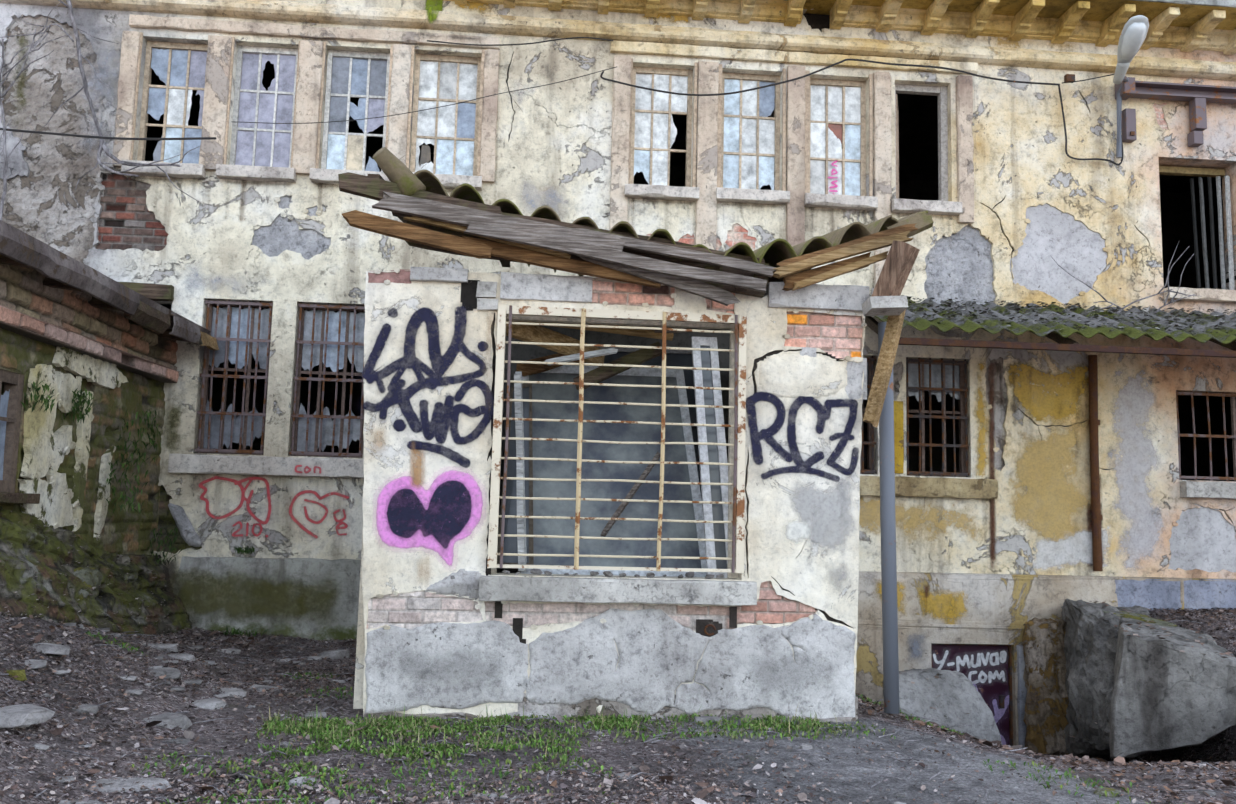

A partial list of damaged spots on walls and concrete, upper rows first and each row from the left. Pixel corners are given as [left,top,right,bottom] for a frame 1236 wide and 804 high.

flaking render [0,16,169,264]
flaking render [251,191,332,260]
flaking render [677,234,695,245]
flaking render [716,223,757,250]
flaking render [924,224,996,306]
flaking render [1010,203,1109,304]
flaking render [782,309,867,404]
flaking render [17,346,128,542]
flaking render [1168,504,1236,572]
water stain [160,560,337,619]